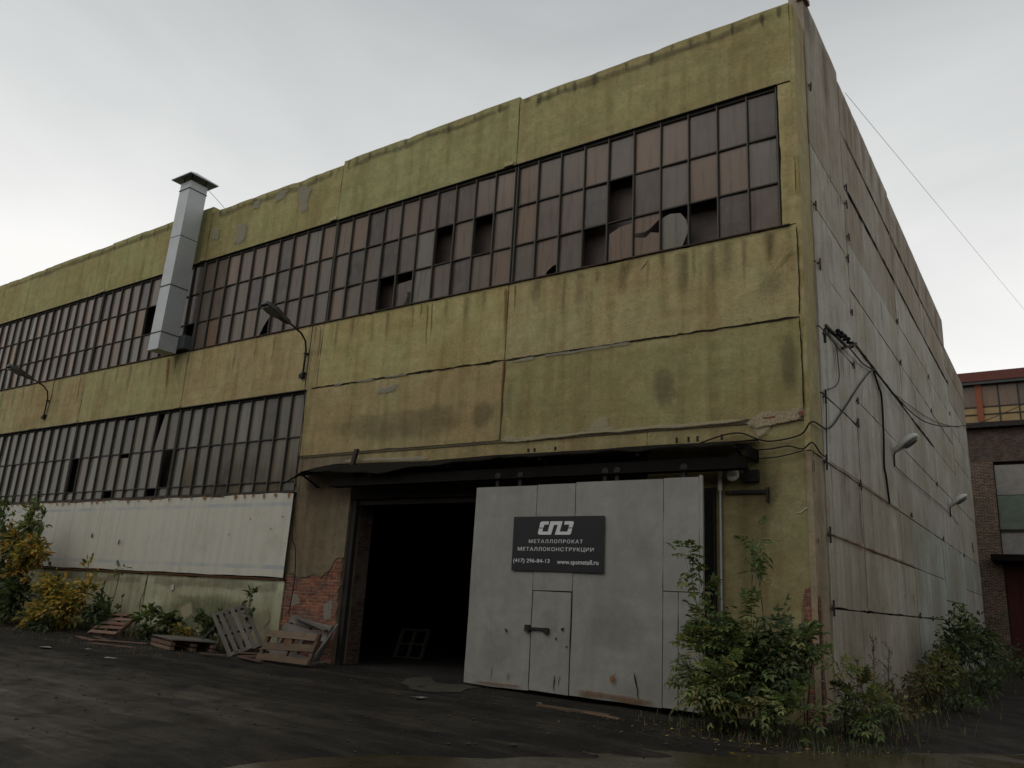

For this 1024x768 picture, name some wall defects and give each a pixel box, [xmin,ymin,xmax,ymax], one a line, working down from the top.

spalling [502,405,803,442]